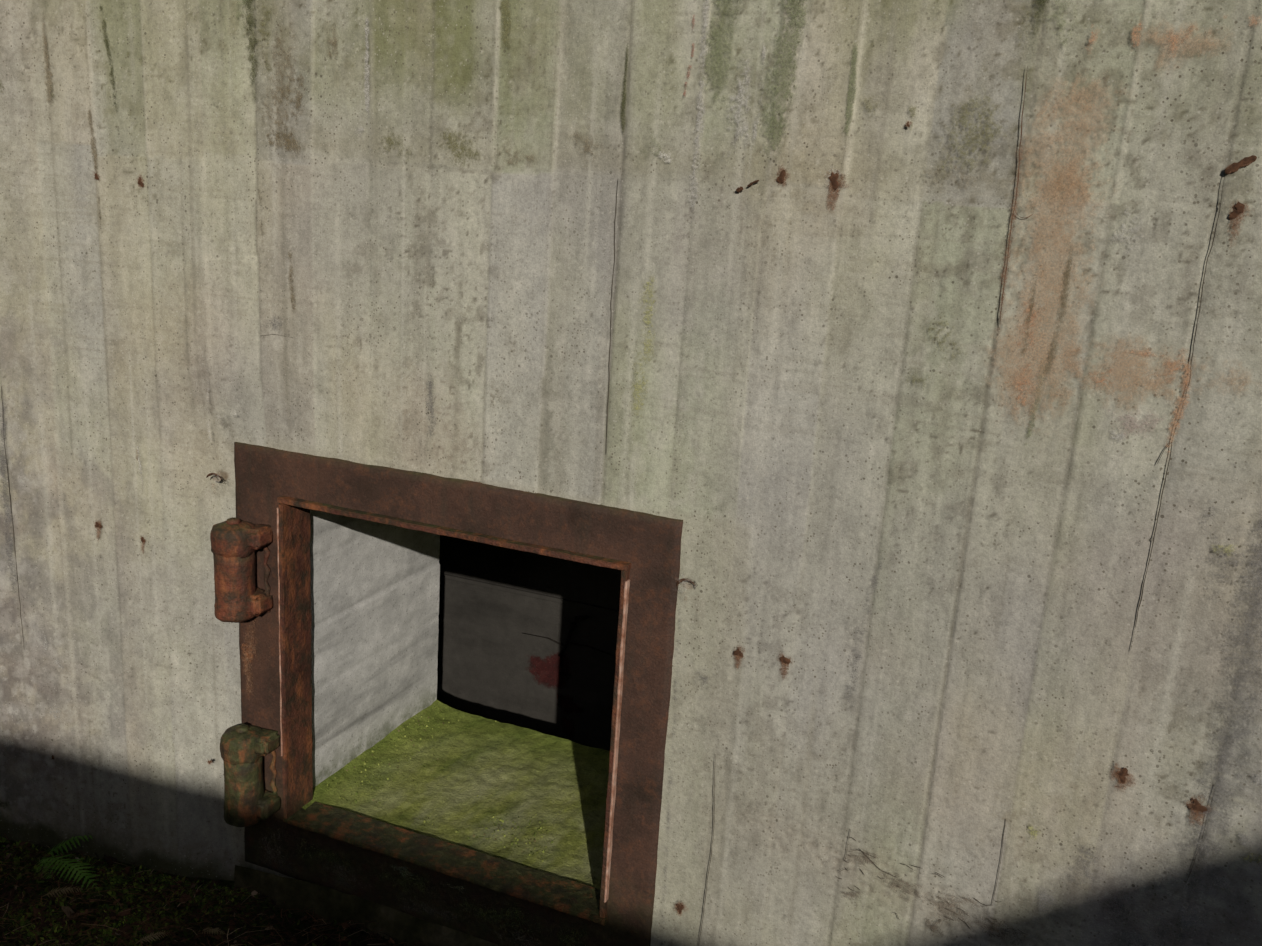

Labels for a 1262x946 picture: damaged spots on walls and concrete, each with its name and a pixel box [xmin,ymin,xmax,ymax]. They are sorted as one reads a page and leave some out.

corrosion [777,168,789,186]
corrosion [827,169,847,209]
corrosion [1225,155,1257,174]
corrosion [1227,201,1249,244]
corrosion [779,654,791,677]
corrosion [1113,763,1135,790]
corrosion [1187,796,1210,825]
crack [845,830,897,878]